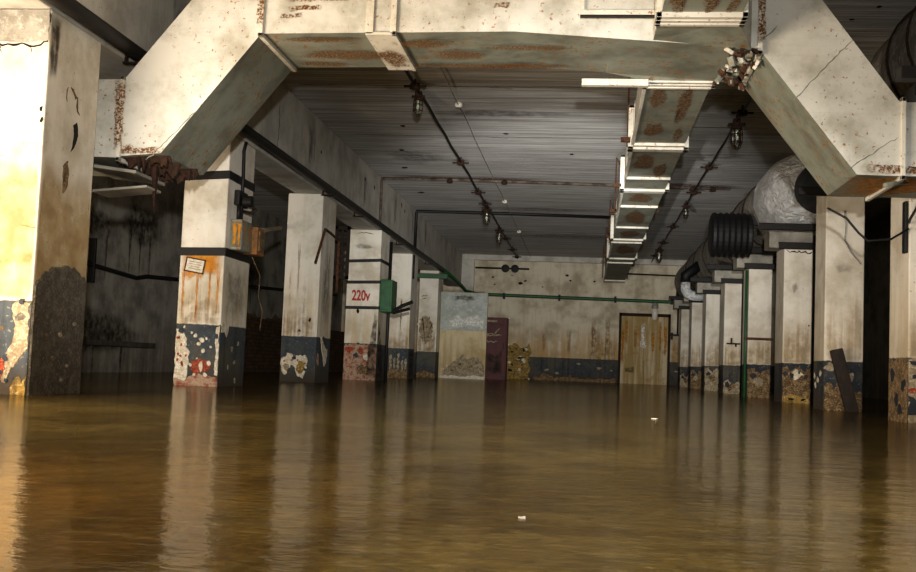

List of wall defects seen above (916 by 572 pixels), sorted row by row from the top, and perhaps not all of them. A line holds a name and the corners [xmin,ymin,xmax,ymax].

corrosion [281,0,328,18]
corrosion [758,0,766,39]
corrosion [114,83,159,154]
corrosion [852,165,916,195]
leakage [0,170,110,296]
corrosion [617,194,651,254]
corrosion [182,256,219,314]
spalling [0,265,87,396]
peeling [173,325,239,387]
peeling [280,353,308,379]
peeling [343,343,376,381]
peeling [888,358,916,423]